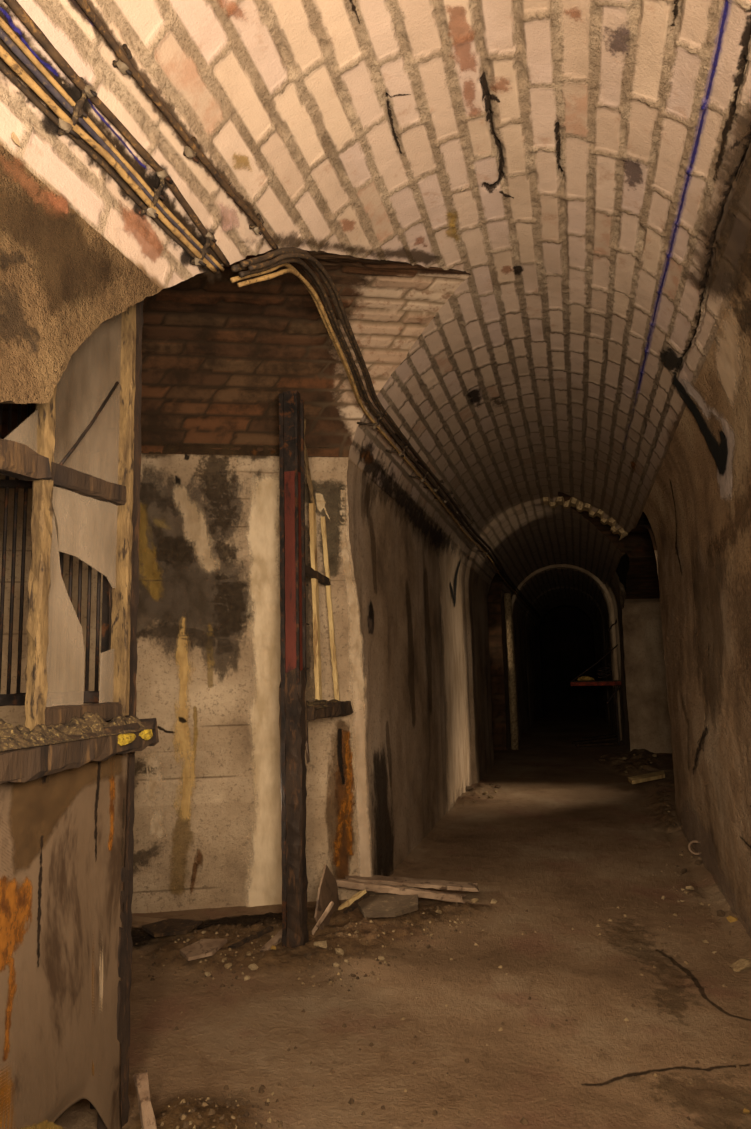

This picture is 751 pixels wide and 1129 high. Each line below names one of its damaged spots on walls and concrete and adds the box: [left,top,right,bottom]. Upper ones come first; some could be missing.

crack [386,92,411,154]
crack [479,72,514,198]
crack [554,121,564,180]
crack [680,6,751,359]
damp [689,109,751,403]
damp [136,443,282,907]
rust [326,720,354,879]
rust [0,818,63,1129]
crack [656,950,751,1021]
crack [581,1064,751,1086]